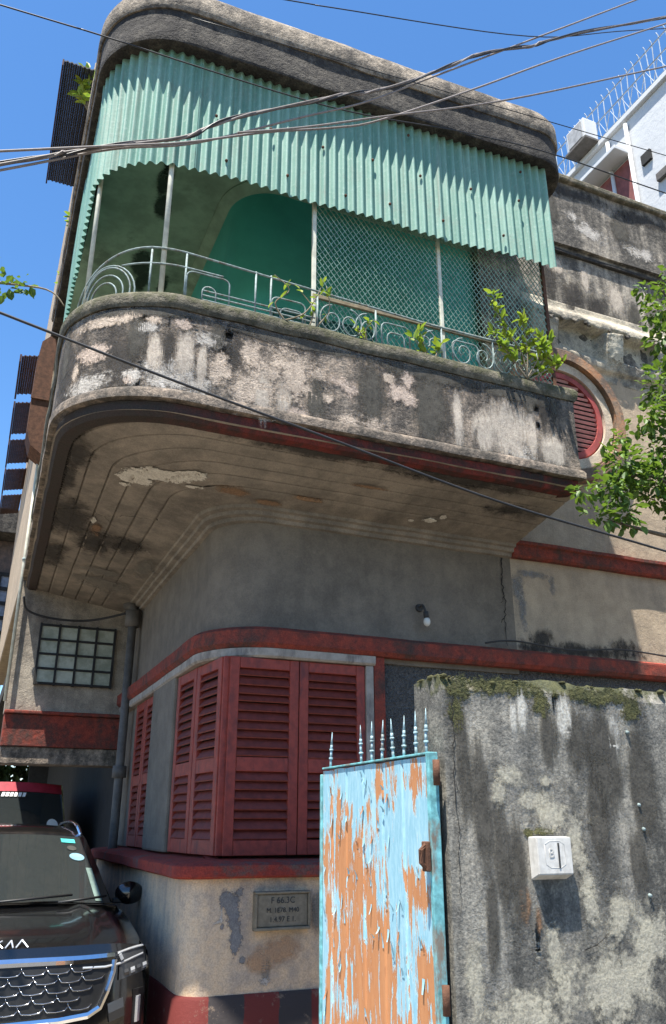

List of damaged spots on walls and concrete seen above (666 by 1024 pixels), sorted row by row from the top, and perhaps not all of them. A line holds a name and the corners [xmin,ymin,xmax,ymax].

damp [55,307,566,466]
damp [42,436,154,575]
peeling [114,466,208,489]
damp [385,465,531,494]
crack [499,558,507,643]
damp [510,695,526,730]
damp [456,718,527,969]
damp [540,698,657,888]